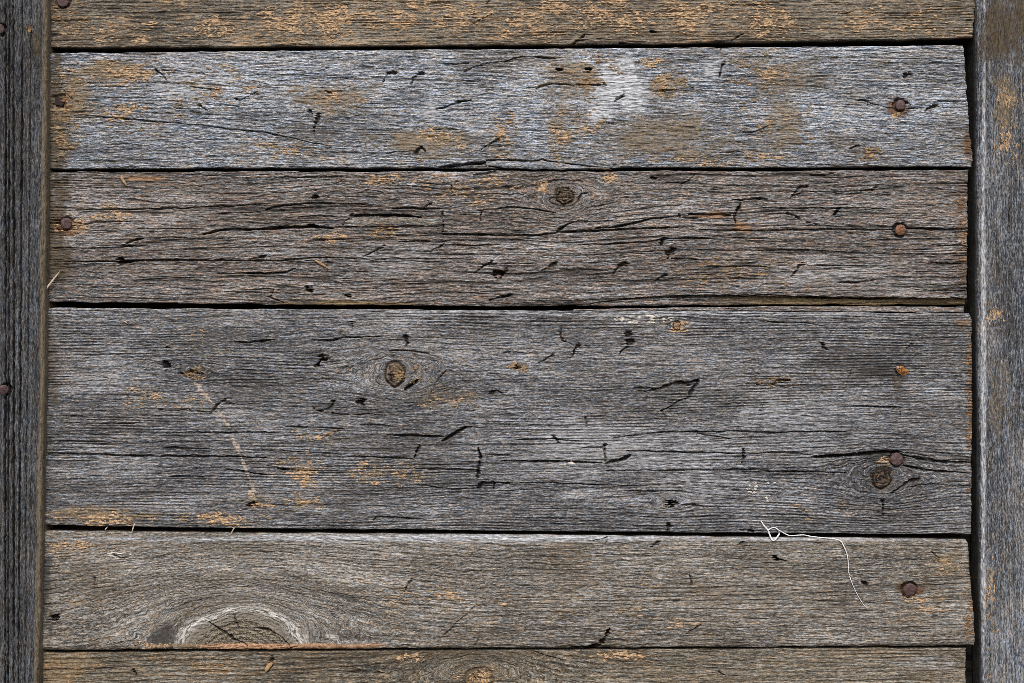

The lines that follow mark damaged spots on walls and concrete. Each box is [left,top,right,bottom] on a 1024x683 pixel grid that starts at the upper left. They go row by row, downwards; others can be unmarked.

crack [104,198,879,247]
crack [906,225,965,233]